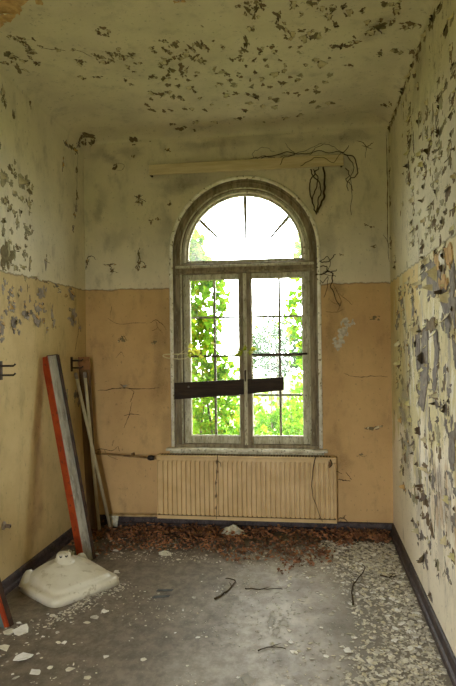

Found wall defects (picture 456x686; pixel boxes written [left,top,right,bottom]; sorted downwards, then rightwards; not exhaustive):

flaking render [0,0,43,28]
peeling [0,35,43,74]
peeling [71,47,142,86]
peeling [64,132,96,155]
peeling [0,159,81,343]
peeling [144,0,456,585]
crack [98,384,154,427]